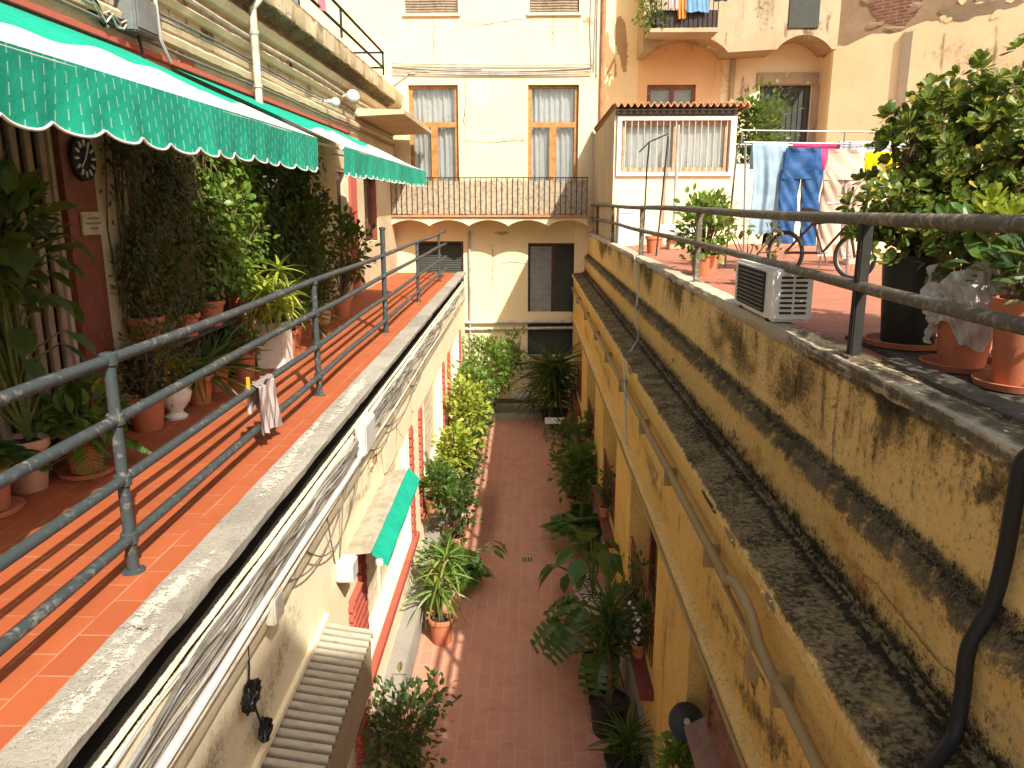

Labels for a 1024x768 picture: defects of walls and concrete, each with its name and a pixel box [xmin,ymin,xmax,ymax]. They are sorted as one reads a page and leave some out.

flaking render [860,0,924,33]
water stain [585,241,1024,638]
water stain [978,603,1024,698]
water stain [736,678,787,759]